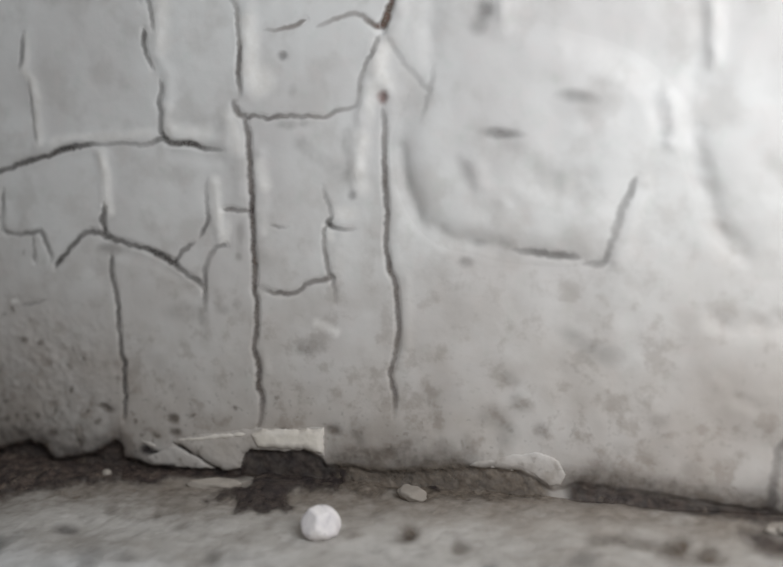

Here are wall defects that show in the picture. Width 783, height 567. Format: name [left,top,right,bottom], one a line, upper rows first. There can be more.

crack [371,0,394,29]
crack [0,143,88,173]
crack [160,137,202,149]
crack [56,208,179,267]
crack [247,133,264,402]
crack [387,254,400,332]
crack [111,275,127,406]
peeling [142,427,325,470]
peeling [470,452,566,486]